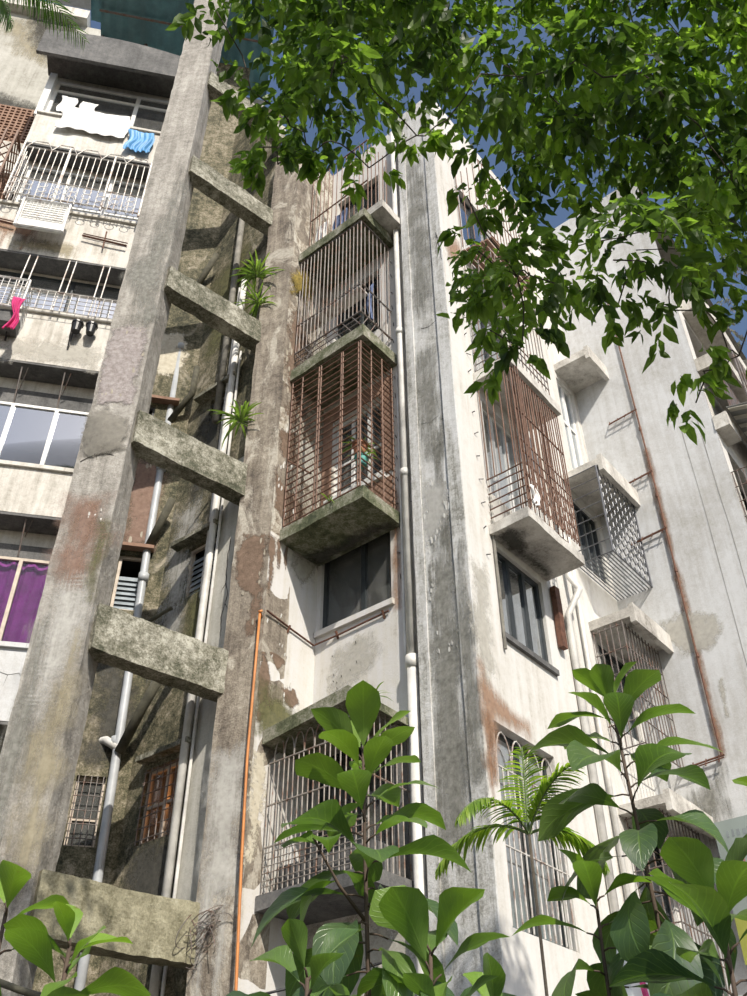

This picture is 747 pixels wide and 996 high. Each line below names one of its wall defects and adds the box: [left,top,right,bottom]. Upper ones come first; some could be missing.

leakage [212,243,253,313]
leakage [406,166,432,313]
leakage [198,398,229,449]
leakage [415,348,444,485]
rust [645,452,673,552]
leakage [162,509,196,631]
peeling [235,533,288,635]
leakage [80,663,136,764]
peeling [256,643,299,723]
leakage [429,501,494,842]
rust [479,677,529,786]